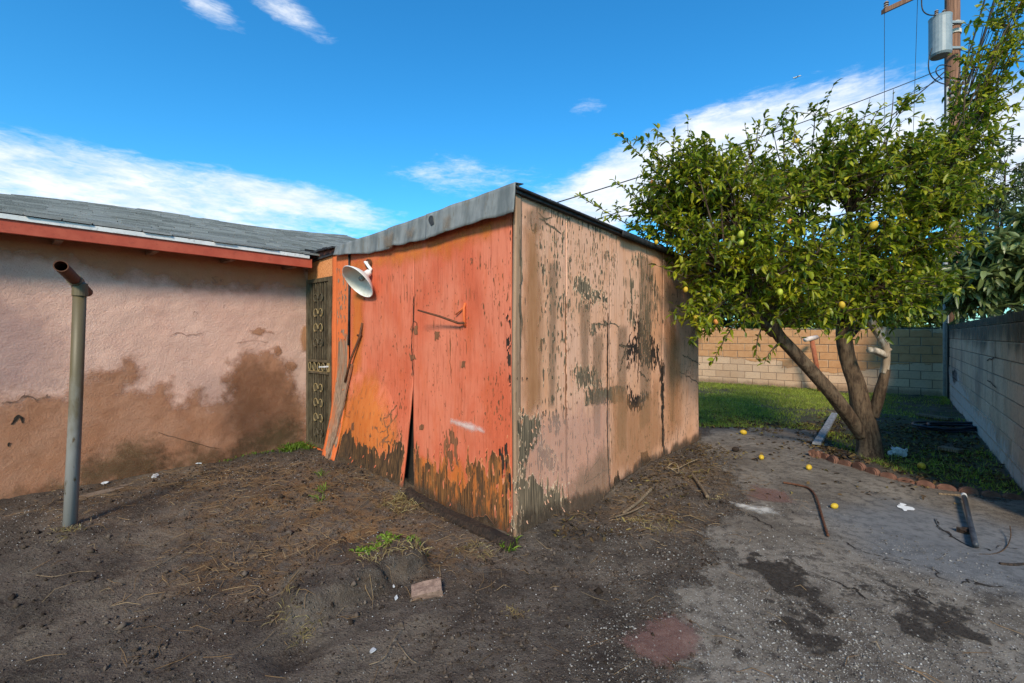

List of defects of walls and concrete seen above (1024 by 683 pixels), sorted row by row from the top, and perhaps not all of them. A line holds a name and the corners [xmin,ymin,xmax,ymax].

damp [0,396,69,499]
damp [80,346,306,486]
peeling [326,269,406,468]
peeling [439,427,461,485]
damp [334,381,701,537]
peeling [457,204,699,524]